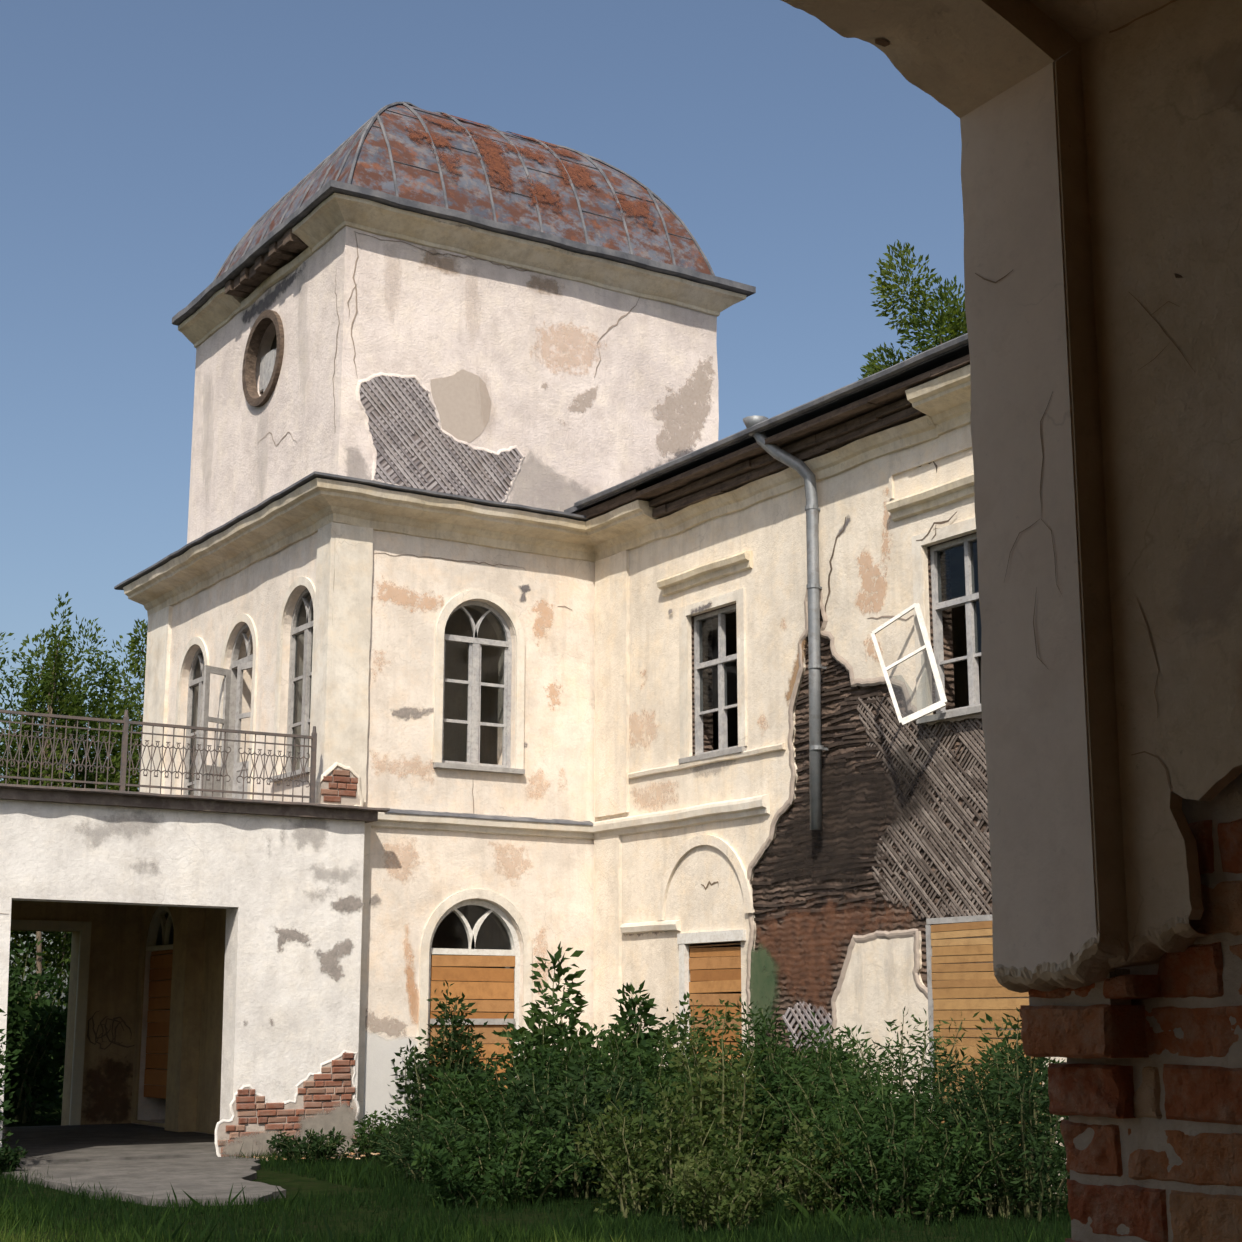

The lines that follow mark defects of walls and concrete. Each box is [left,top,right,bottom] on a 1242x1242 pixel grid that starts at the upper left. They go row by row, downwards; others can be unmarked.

corrosion [405,112,597,212]
corrosion [613,194,659,231]
crack [332,231,546,425]
spalling [356,369,525,503]
peeling [655,357,715,457]
crack [825,517,846,613]
crack [1004,392,1059,670]
spalling [315,762,364,807]
spalling [745,589,992,1068]
spalling [275,929,353,981]
spalling [994,773,1242,1242]
spalling [215,1050,360,1158]